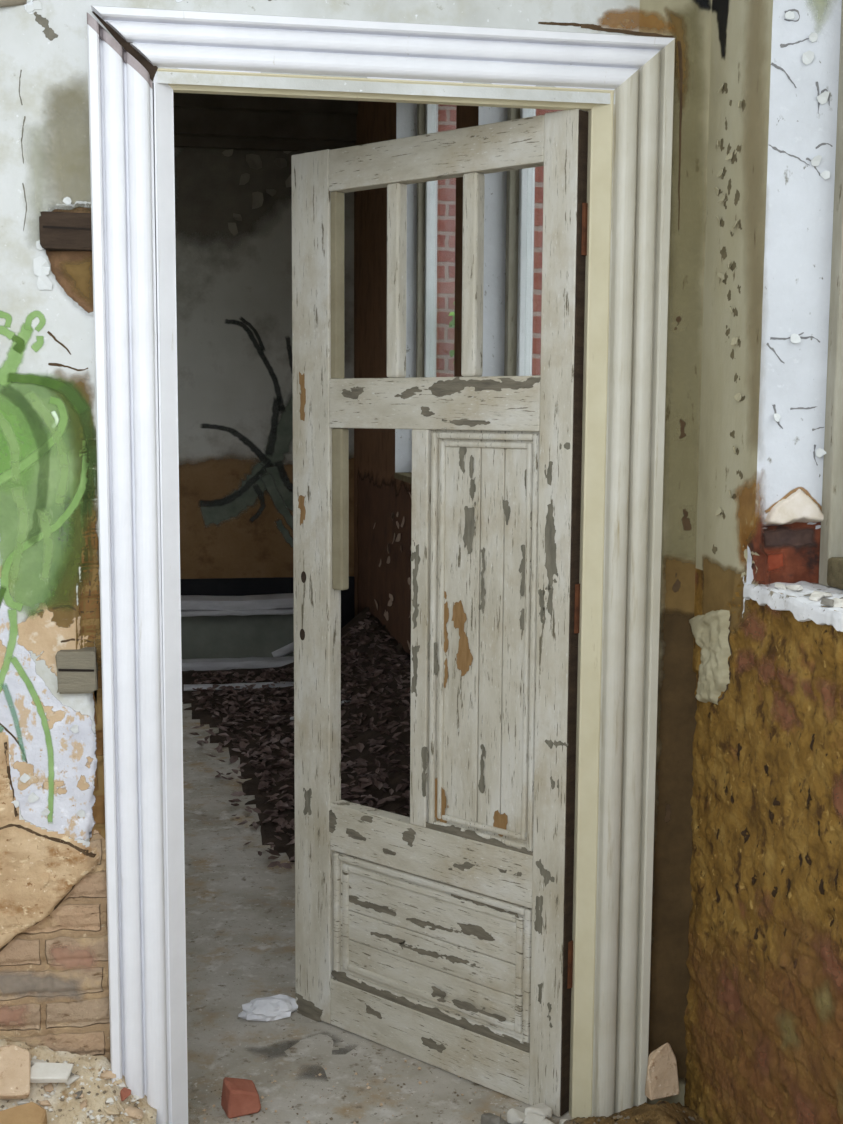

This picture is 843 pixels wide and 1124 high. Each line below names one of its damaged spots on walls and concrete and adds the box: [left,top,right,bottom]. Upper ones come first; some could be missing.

peeling [784,9,800,22]
peeling [816,82,830,114]
peeling [769,143,832,180]
flaking render [52,197,91,213]
peeling [714,83,746,360]
flaking render [33,240,94,313]
peeling [767,332,820,363]
peeling [772,404,816,429]
peeling [813,445,826,466]
flaking render [716,470,824,585]
flaking render [689,598,746,705]
flaking render [0,553,111,1063]